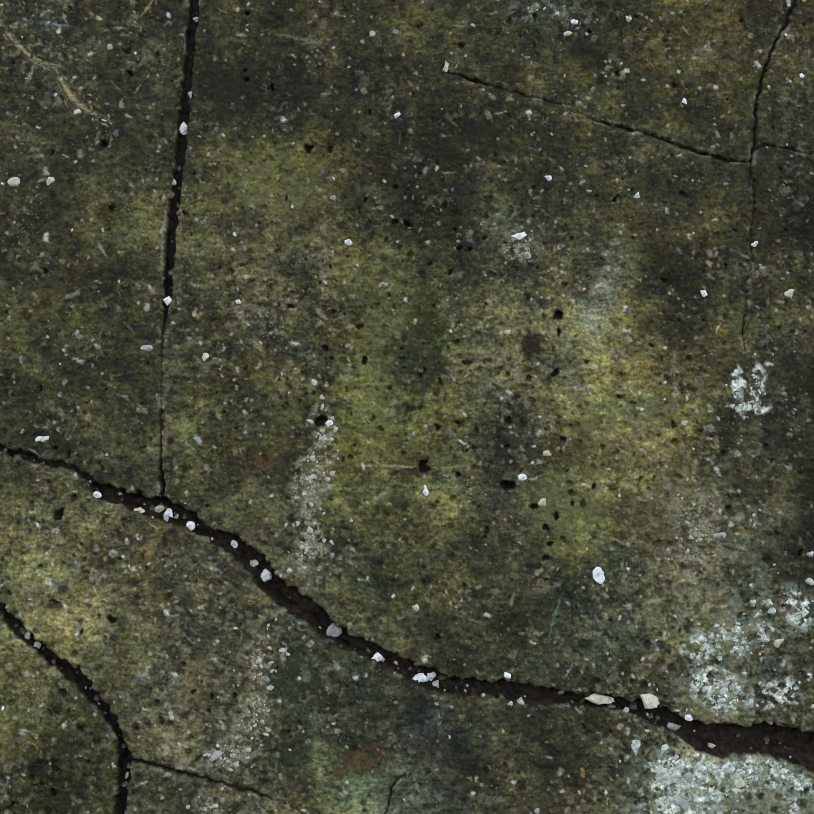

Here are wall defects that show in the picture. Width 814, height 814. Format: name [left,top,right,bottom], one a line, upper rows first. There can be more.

crack [157,0,200,496]
crack [441,0,814,361]
efflorescence [725,365,769,418]
crack [0,601,306,814]
crack [382,768,414,814]
crack [0,442,814,774]
damp [631,740,641,756]
damp [640,744,812,814]
damp [681,578,814,716]
damp [785,516,814,562]